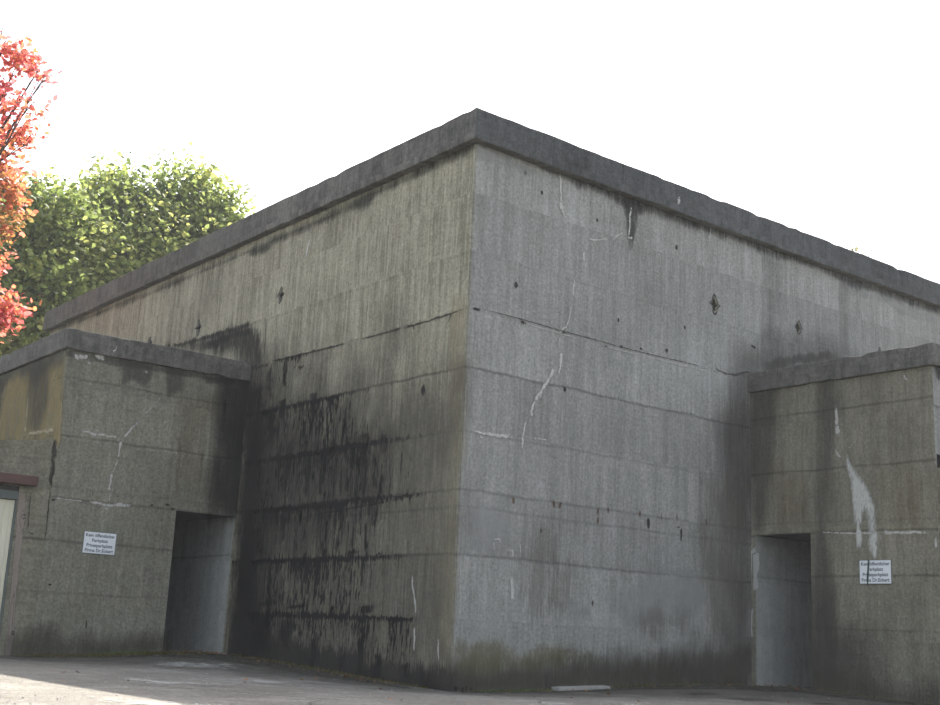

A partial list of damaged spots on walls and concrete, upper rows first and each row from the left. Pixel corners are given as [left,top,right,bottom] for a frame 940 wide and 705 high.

damp [174,322,252,349]
crack [264,325,341,361]
crack [364,208,695,448]
crack [717,368,750,376]
crack [83,397,161,501]
damp [0,347,940,705]